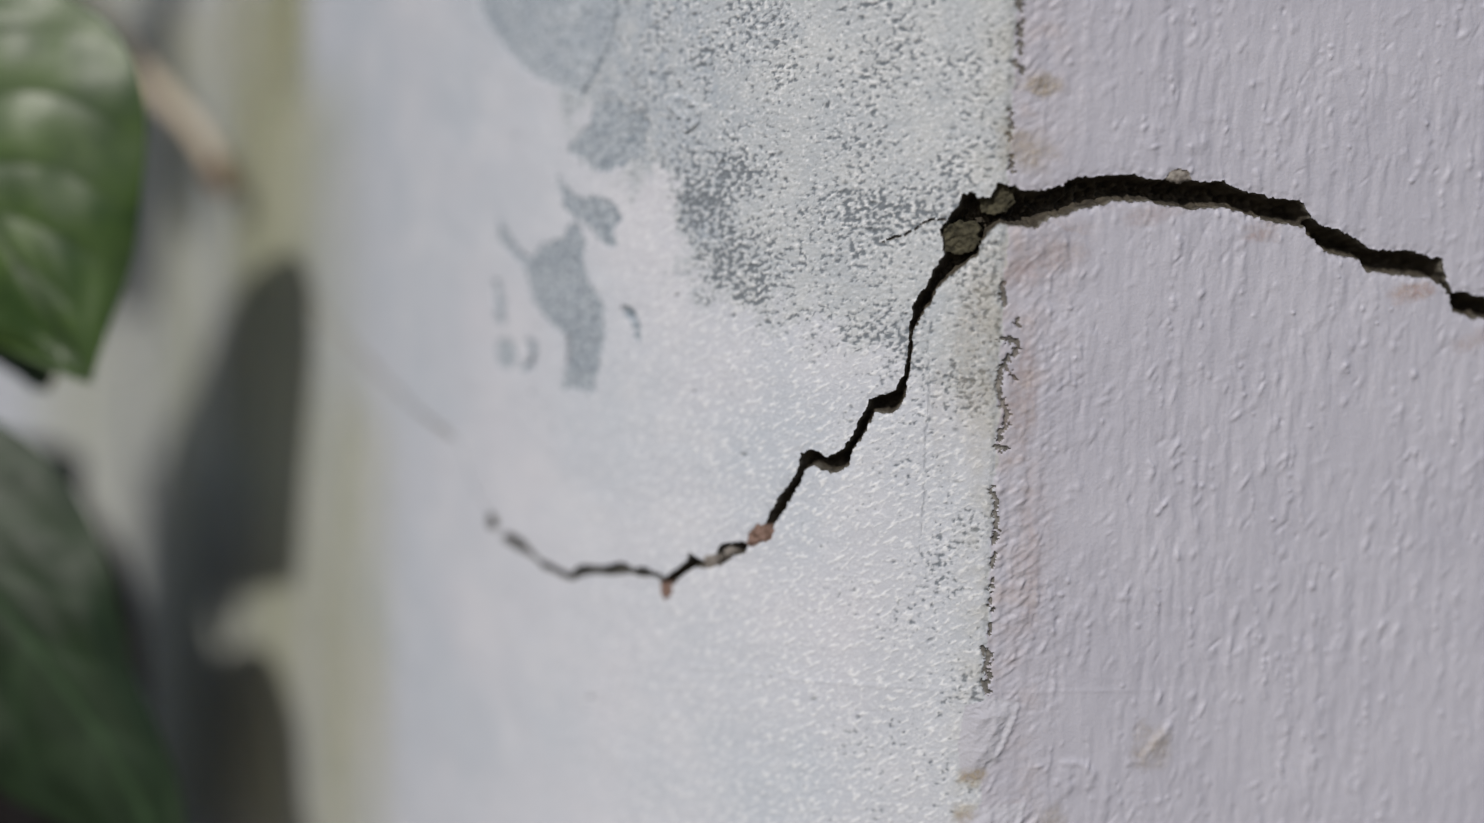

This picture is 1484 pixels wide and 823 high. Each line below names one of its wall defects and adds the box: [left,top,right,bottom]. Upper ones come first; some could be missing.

peeling [479,0,651,174]
peeling [494,175,642,394]
crack [304,0,1484,696]